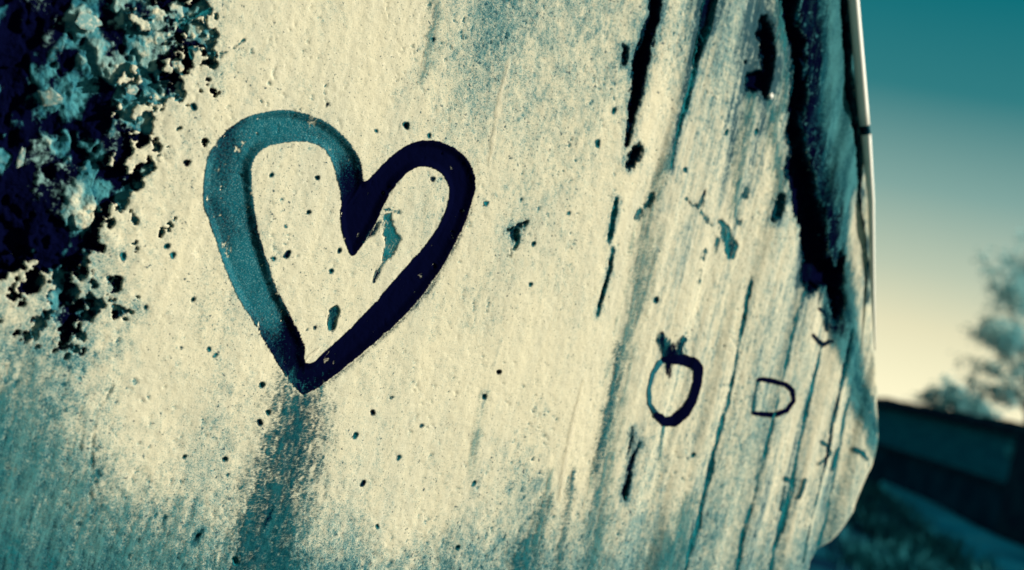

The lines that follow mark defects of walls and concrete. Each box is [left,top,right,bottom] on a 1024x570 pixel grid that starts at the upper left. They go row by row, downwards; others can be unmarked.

spalling [0,0,220,360]
water stain [730,0,878,457]